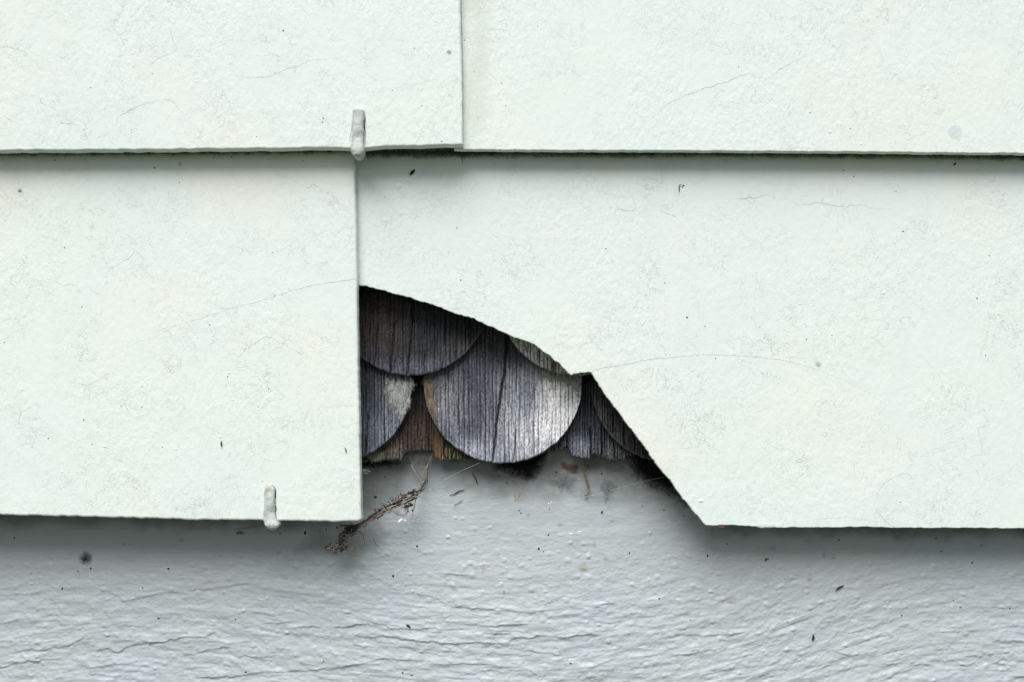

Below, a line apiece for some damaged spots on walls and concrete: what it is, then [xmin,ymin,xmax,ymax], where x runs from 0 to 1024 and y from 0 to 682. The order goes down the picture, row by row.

peeling [384,378,437,422]